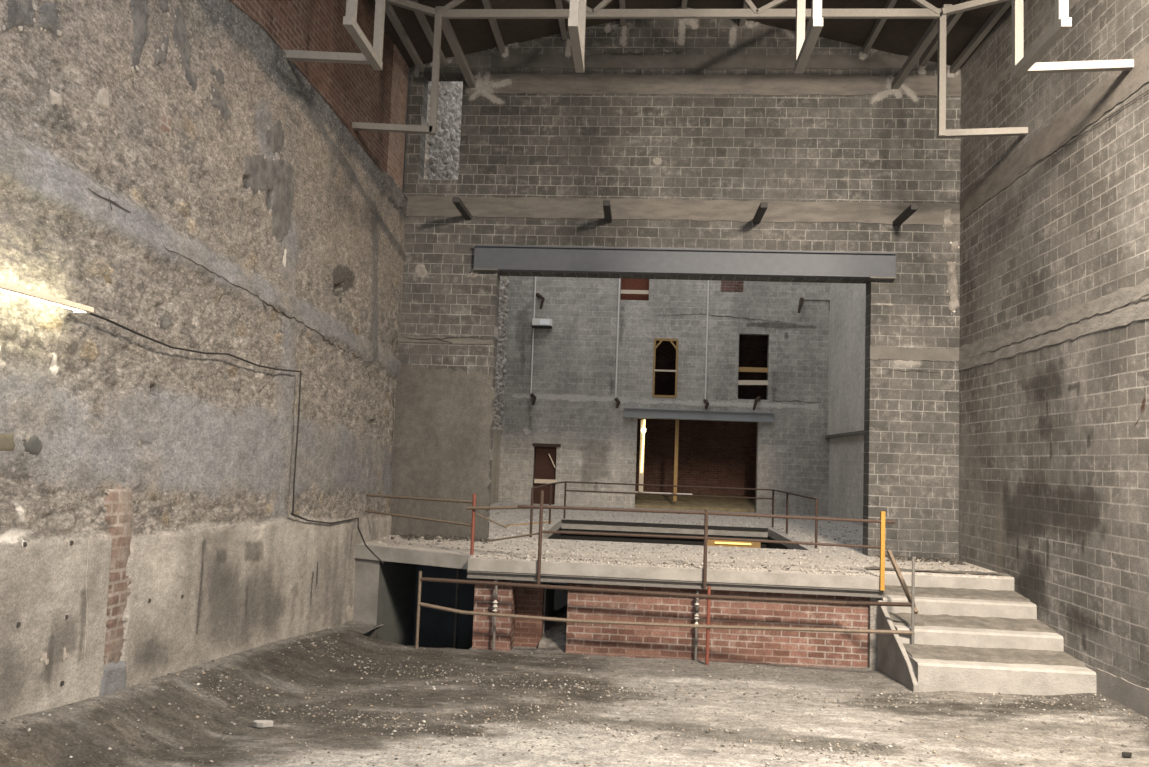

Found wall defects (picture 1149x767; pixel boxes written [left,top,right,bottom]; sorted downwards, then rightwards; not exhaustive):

crack [974,294,1149,357]
spalling [99,484,134,696]